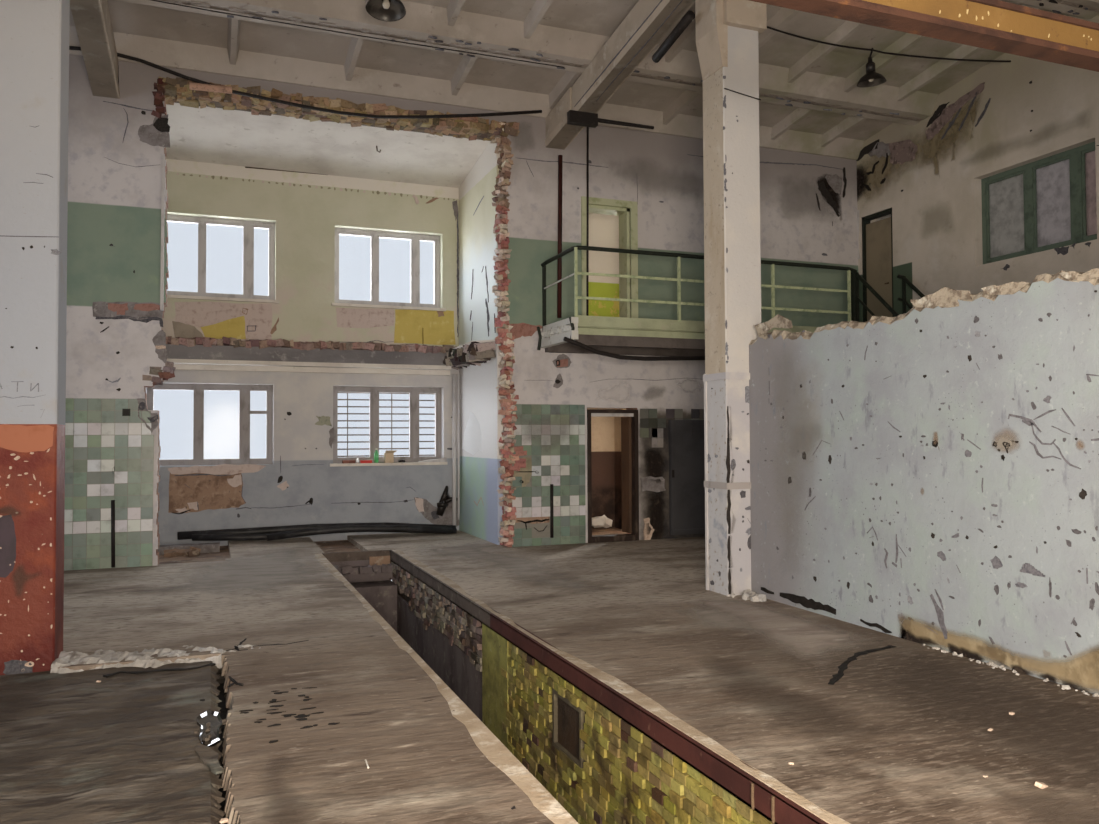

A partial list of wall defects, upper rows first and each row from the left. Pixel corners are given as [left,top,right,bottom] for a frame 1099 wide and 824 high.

flaking render [138,78,170,148]
flaking render [856,82,991,259]
spalling [491,122,550,547]
rust [993,438,1019,461]
crack [1008,408,1081,469]
flaking render [168,464,266,518]
water stain [1020,563,1045,577]
water stain [900,617,1099,693]
crack [103,638,309,824]